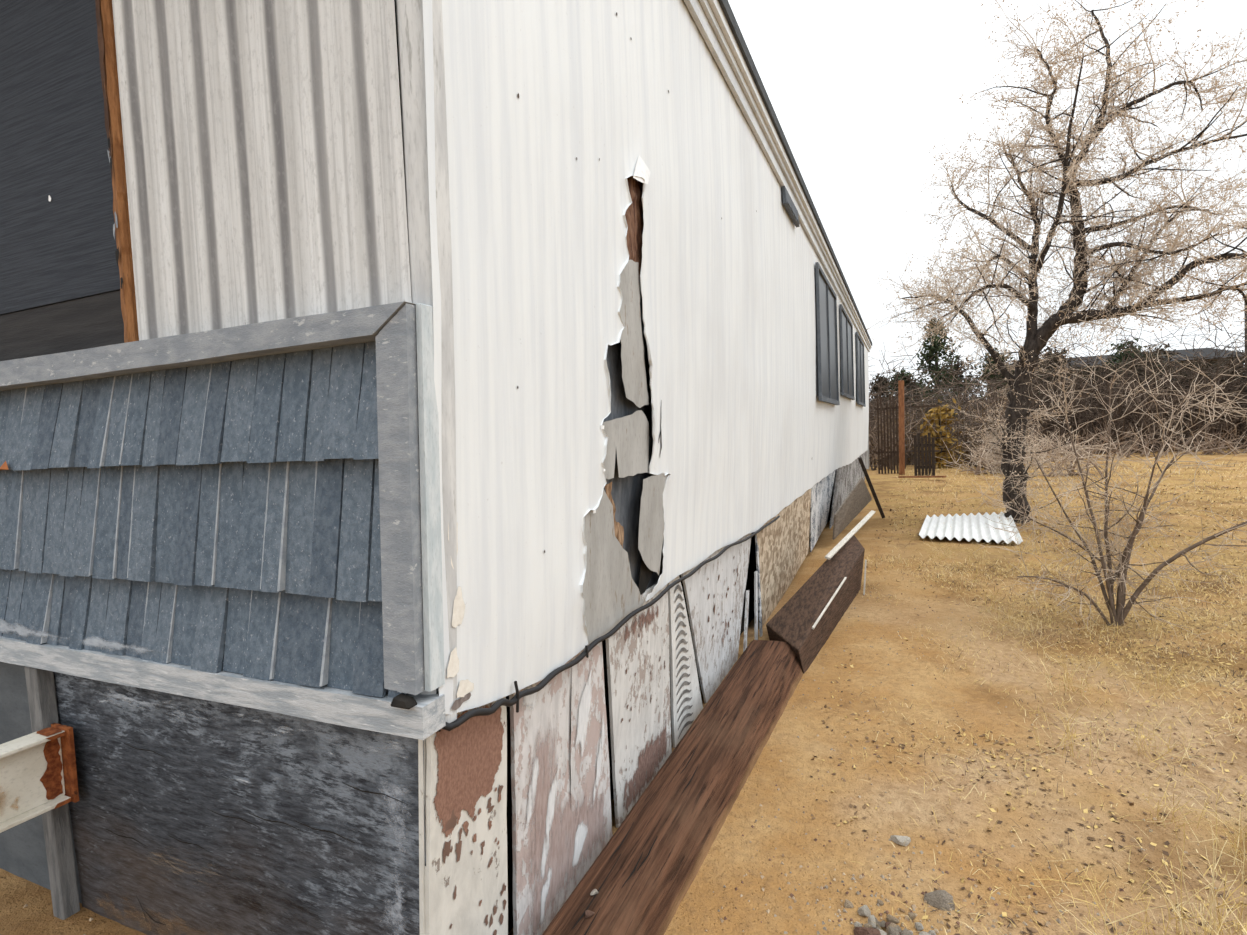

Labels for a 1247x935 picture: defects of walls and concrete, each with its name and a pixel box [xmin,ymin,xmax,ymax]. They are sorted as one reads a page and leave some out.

peeling [619,606,662,642]
peeling [524,683,537,708]
rust [37,727,71,809]
peeling [433,647,506,867]
peeling [526,670,606,935]
peeling [622,726,669,812]
peeling [479,884,506,935]